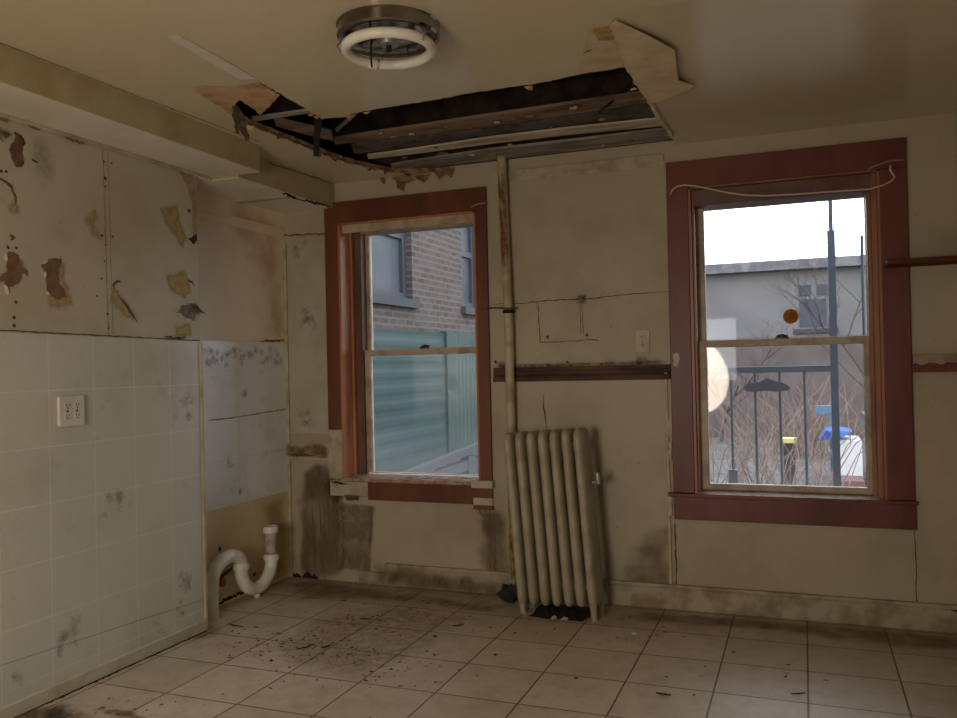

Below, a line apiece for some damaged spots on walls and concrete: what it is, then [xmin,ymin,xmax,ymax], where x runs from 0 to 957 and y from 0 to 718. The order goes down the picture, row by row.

peeling [175,302,206,321]
leakage [286,445,372,575]
leakage [18,707,76,718]